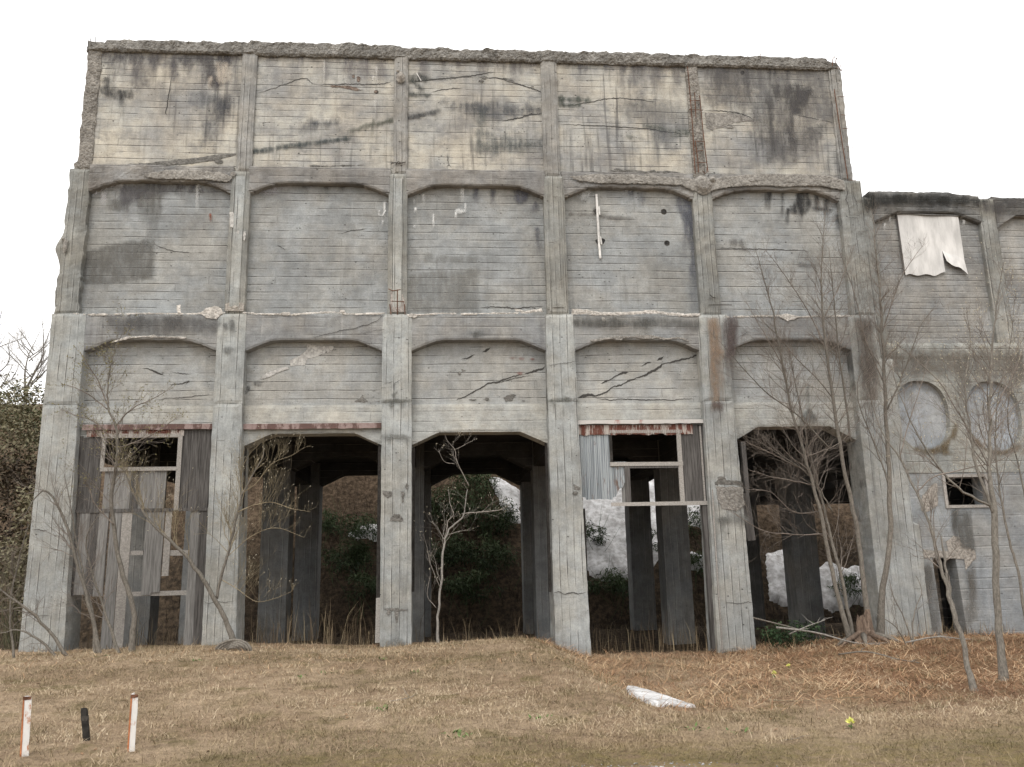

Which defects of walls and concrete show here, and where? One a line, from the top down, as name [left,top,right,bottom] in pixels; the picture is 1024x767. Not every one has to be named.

leakage [103,52,233,89]
crack [259,72,680,134]
spalling [570,66,856,191]
leakage [708,68,833,156]
leakage [83,241,152,282]
spalling [73,289,543,319]
crack [457,361,577,400]
crack [578,354,697,401]
corrosion [709,317,737,408]
corrosion [578,424,693,436]
spalling [715,476,745,511]
peeling [923,536,976,569]